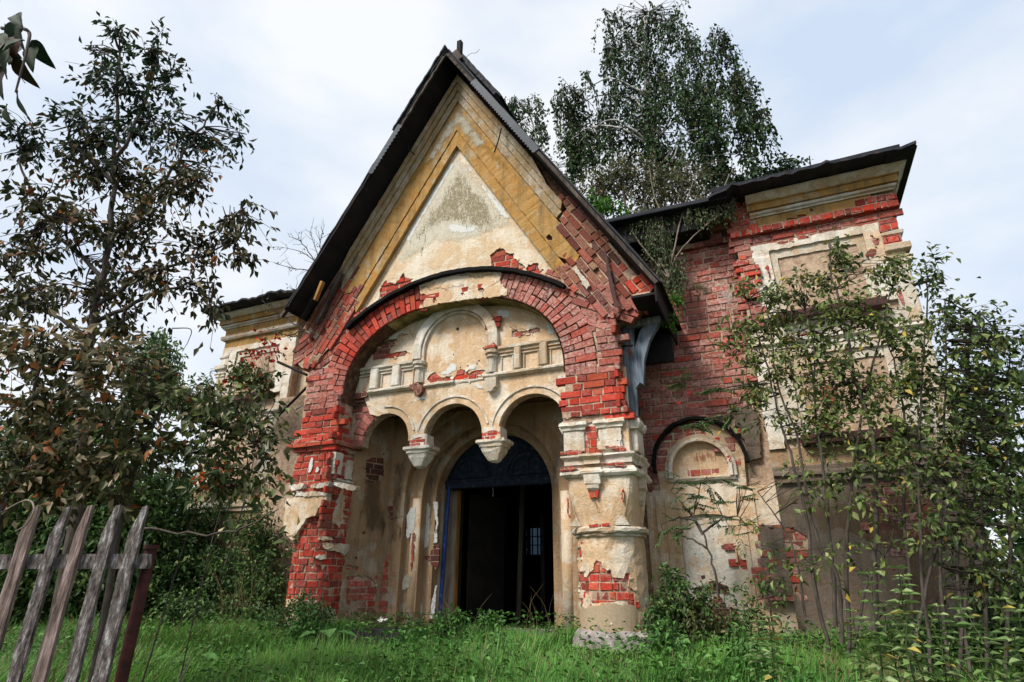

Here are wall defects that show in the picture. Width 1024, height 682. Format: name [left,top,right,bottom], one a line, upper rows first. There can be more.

damp [399,157,509,262]
flaking render [378,272,413,299]
flaking render [491,247,543,273]
flaking render [409,342,498,397]
flaking render [410,533,440,571]
flaking render [577,542,640,608]
flaking render [721,523,808,602]